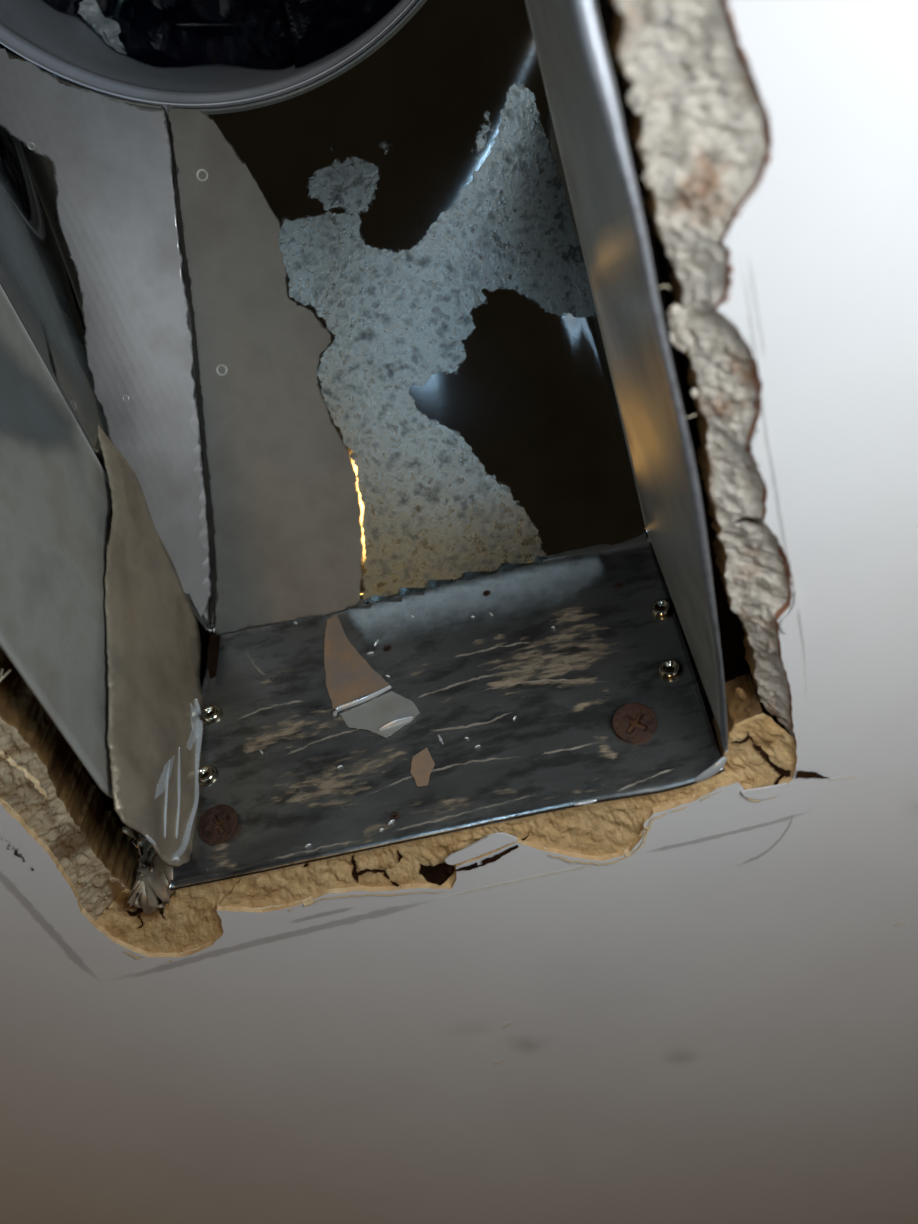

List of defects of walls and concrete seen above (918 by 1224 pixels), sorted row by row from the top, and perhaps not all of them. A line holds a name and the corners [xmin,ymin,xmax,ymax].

spalling [0,0,798,962]
crack [351,850,403,887]
crack [454,834,529,872]